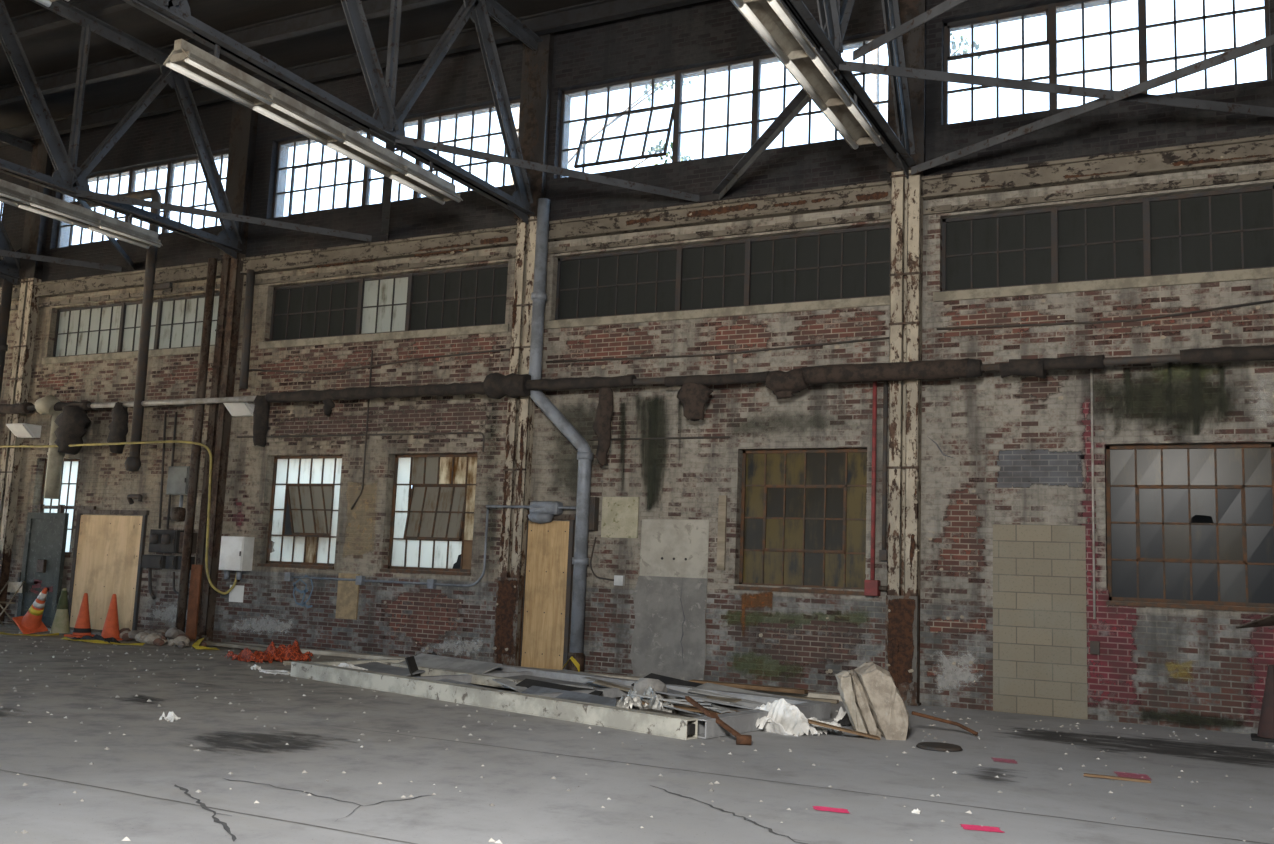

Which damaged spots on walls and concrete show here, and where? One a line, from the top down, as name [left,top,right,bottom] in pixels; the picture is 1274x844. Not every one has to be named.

water stain [620,395,681,510]
peeling [928,478,987,583]
crack [174,784,237,841]
crack [653,786,808,844]